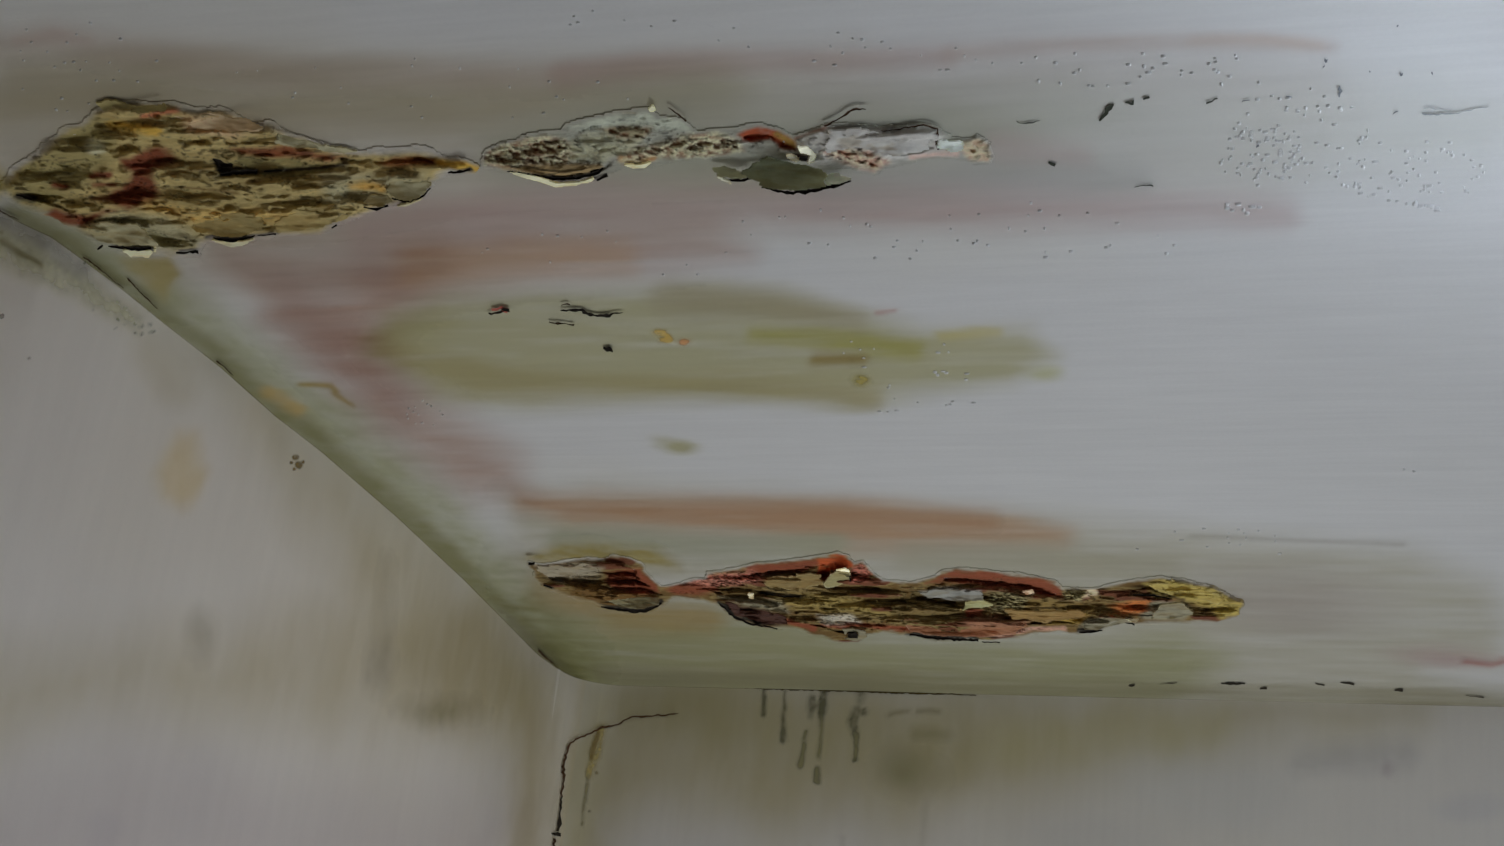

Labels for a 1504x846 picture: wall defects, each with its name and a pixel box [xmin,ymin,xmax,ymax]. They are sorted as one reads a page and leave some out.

spalling [0,98,995,259]
spalling [526,550,1245,644]
crack [551,713,678,846]
damp [798,691,826,784]